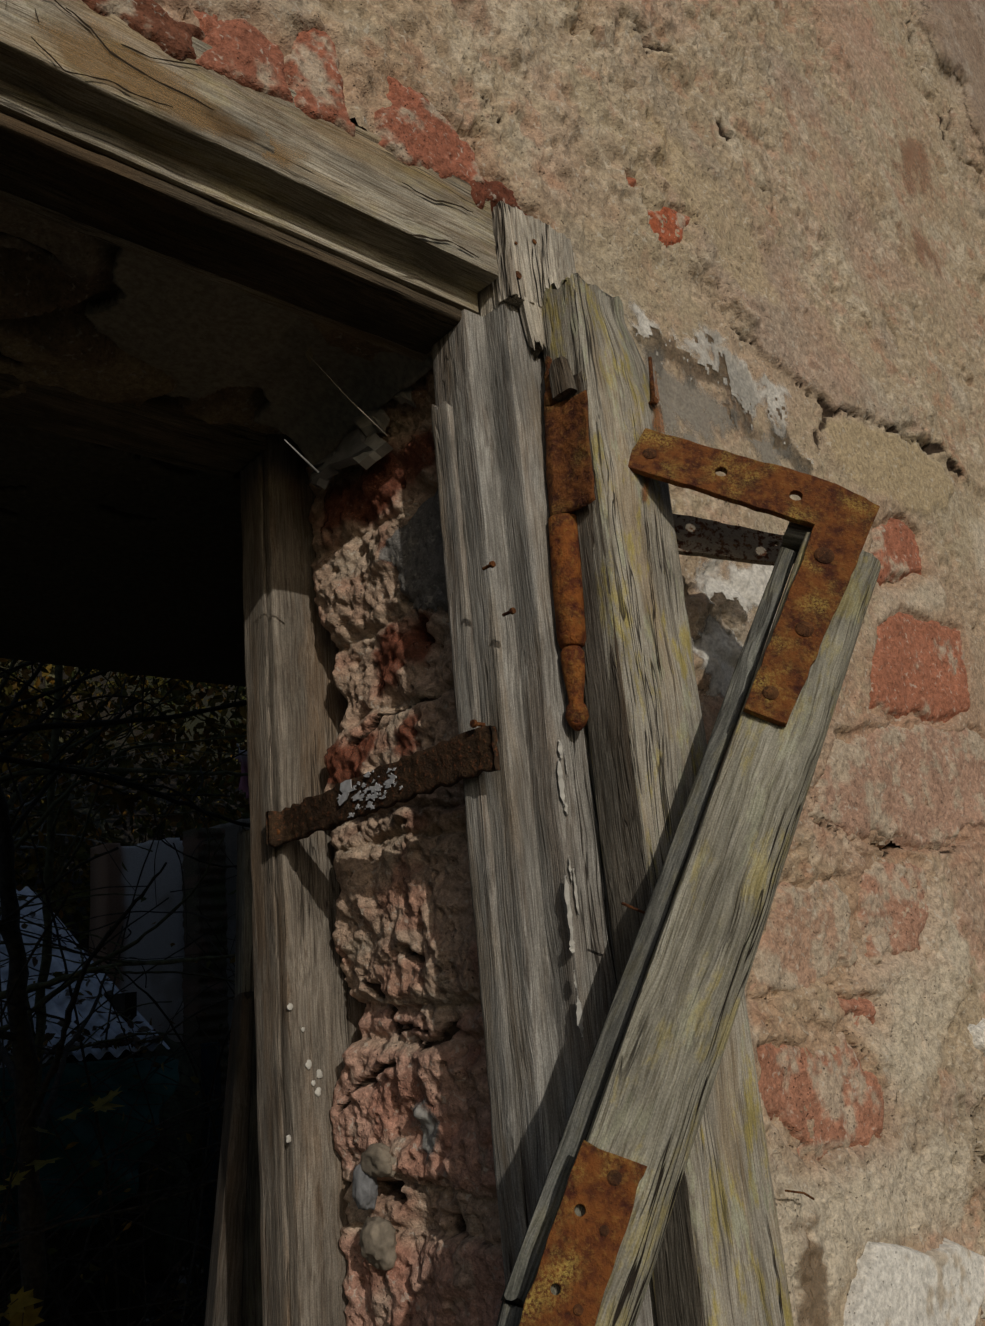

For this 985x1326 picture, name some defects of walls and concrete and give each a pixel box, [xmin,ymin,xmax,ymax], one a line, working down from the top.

spalling [82,0,356,137]
spalling [373,76,527,215]
flaking render [84,247,435,532]
corrosion [651,364,665,433]
crack [717,287,964,477]
spalling [869,518,922,586]
spalling [374,614,436,692]
spalling [324,717,417,818]
spalling [750,612,985,997]
spalling [757,997,884,1161]